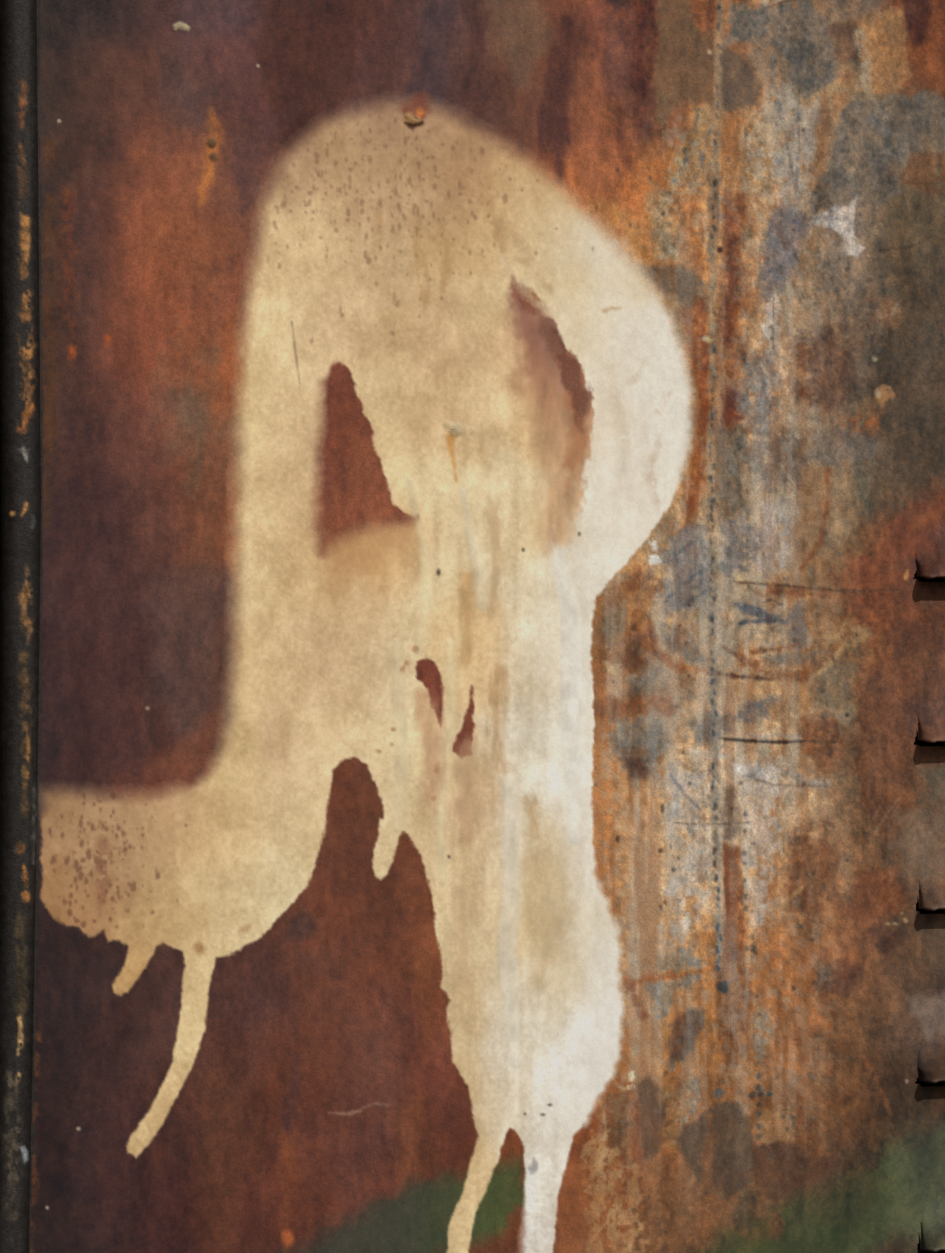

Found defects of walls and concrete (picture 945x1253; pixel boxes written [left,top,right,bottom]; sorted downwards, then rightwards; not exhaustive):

rust [527,0,658,204]
rust [802,0,945,187]
rust [7,76,64,538]
rust [324,419,398,533]
rust [508,300,595,504]
rust [643,183,755,534]
rust [442,658,512,858]
rust [593,554,945,962]
rust [389,857,456,1072]
rust [513,788,580,1003]
rust [623,843,754,1072]
rust [185,1053,304,1253]